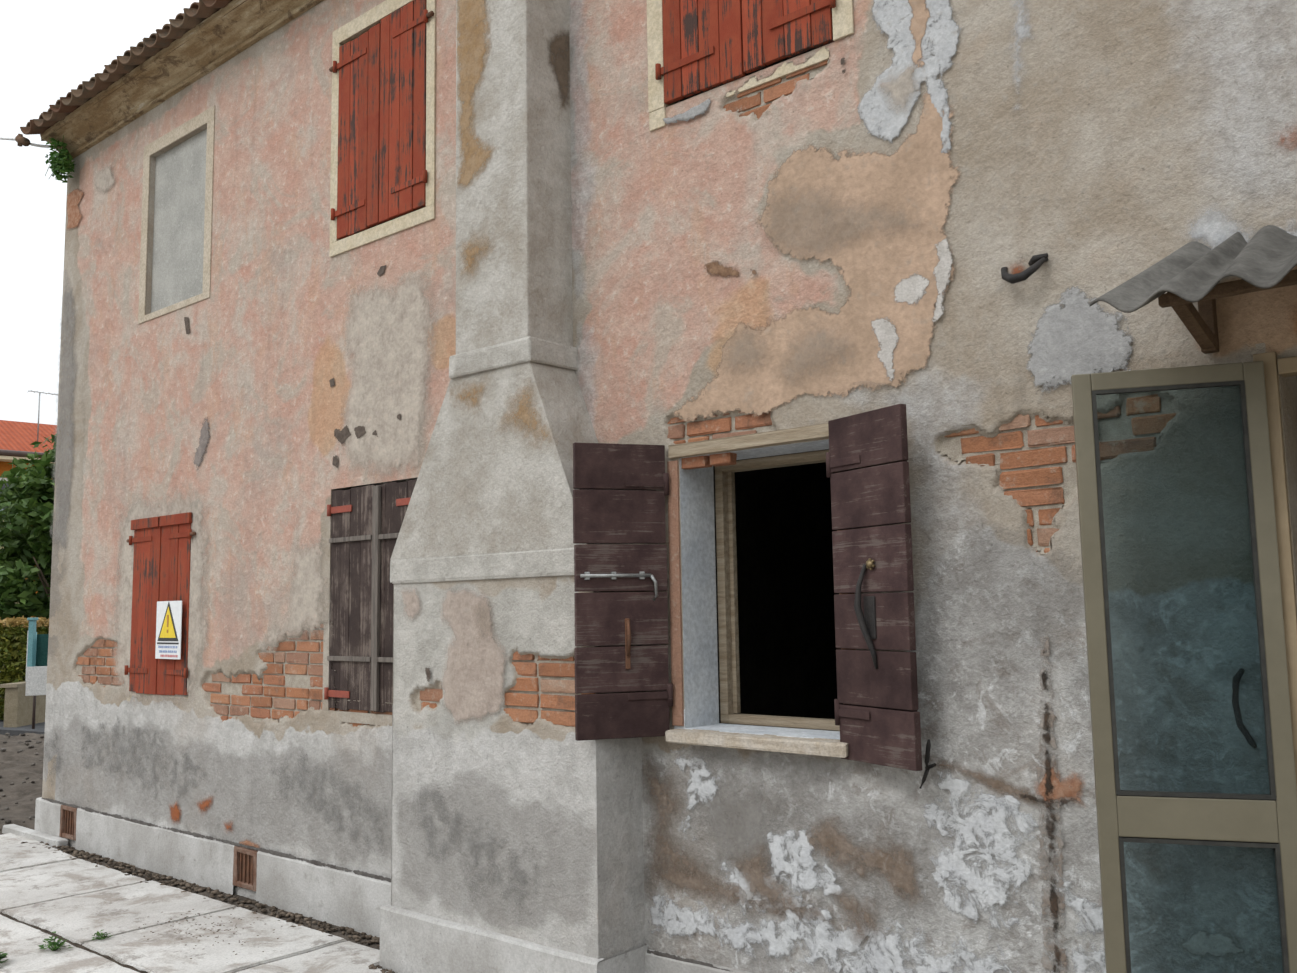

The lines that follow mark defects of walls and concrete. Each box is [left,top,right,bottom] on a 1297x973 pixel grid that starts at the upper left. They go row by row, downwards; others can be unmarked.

peeling [666,0,961,470]
flaking render [934,409,1078,554]
flaking render [1097,391,1183,463]
flaking render [73,493,393,727]
peeling [410,590,600,727]
damp [671,747,720,831]
damp [649,772,1042,973]
crack [1020,636,1074,973]
damp [1054,881,1106,973]